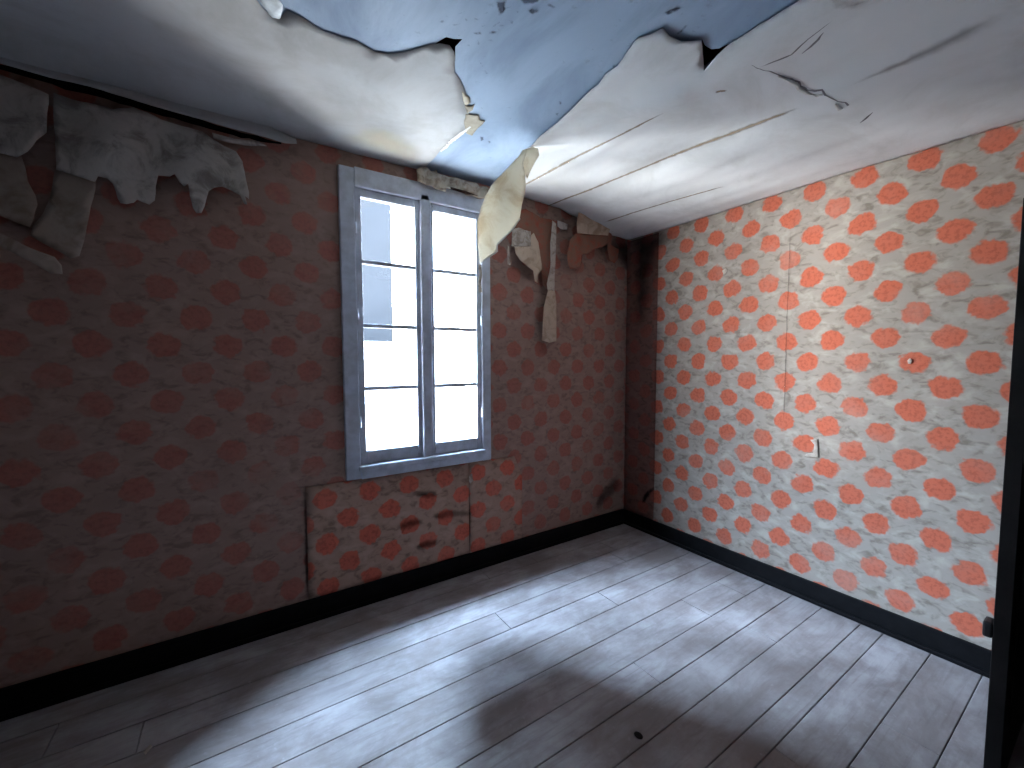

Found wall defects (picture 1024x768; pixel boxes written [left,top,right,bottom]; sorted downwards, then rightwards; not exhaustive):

peeling [259,0,283,19]
spalling [462,92,485,136]
crack [752,27,873,123]
peeling [416,147,539,292]